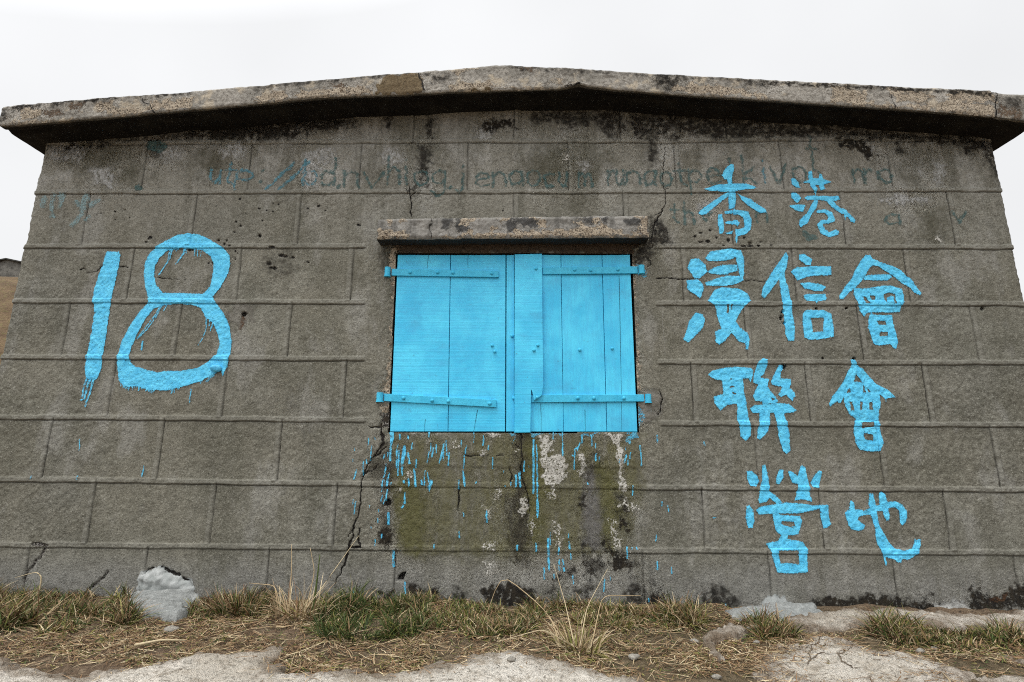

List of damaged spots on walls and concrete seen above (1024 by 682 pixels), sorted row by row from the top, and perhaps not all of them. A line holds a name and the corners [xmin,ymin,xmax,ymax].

damp [482,117,518,133]
damp [532,110,998,174]
crack [647,147,695,280]
crack [334,423,386,588]
damp [373,444,423,555]
damp [480,432,667,607]
crack [23,542,48,582]
damp [409,583,465,602]
damp [702,586,738,608]
damp [812,592,940,610]
damp [968,582,1024,611]